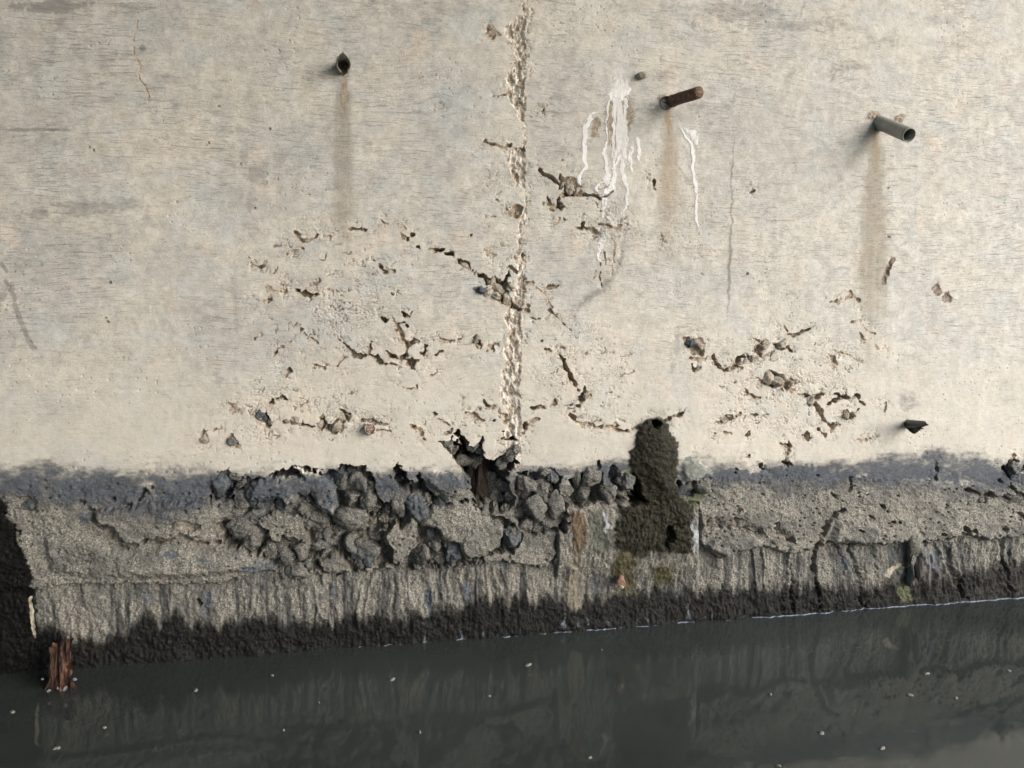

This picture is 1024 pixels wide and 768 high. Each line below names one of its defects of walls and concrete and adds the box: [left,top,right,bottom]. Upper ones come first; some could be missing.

leakage [592,99,634,149]
crack [284,0,634,474]
crack [253,311,439,377]
spalling [682,336,708,363]
spalling [756,369,800,394]
spalling [827,354,839,370]
spalling [714,412,742,425]
spalling [801,427,827,443]
spalling [173,404,636,580]
leakage [676,449,1024,494]
crack [809,477,853,586]
leakage [0,460,1024,674]